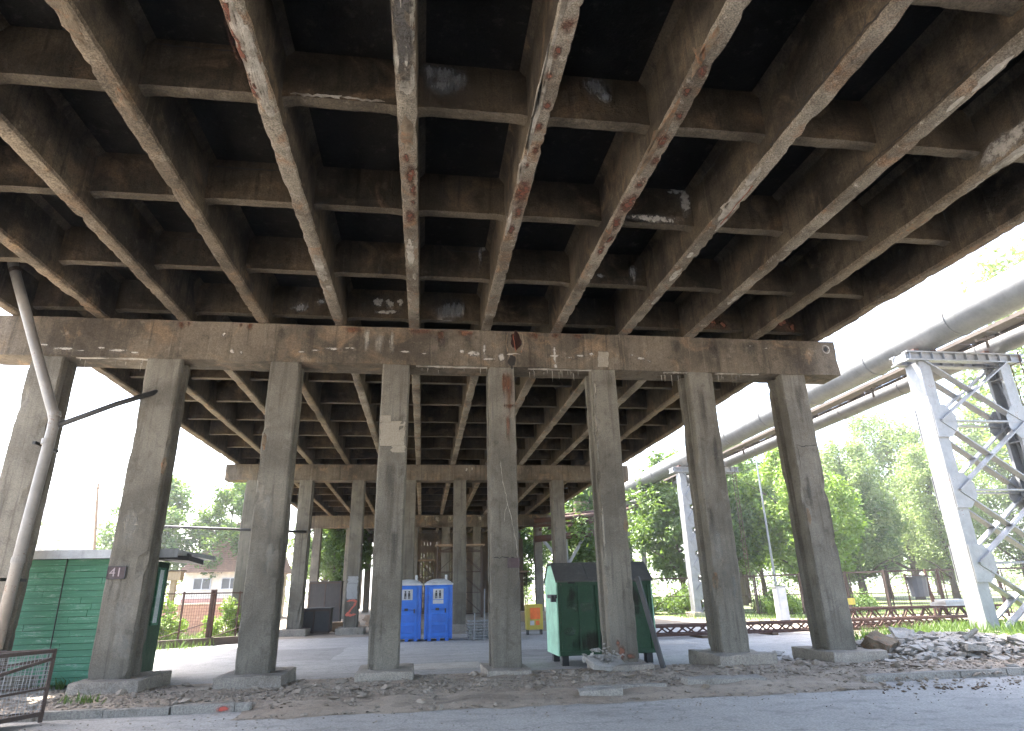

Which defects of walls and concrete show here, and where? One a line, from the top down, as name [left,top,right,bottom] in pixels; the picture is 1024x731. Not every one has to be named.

leakage [667,189,690,211]
spalling [483,331,524,369]
peeling [390,445,407,453]